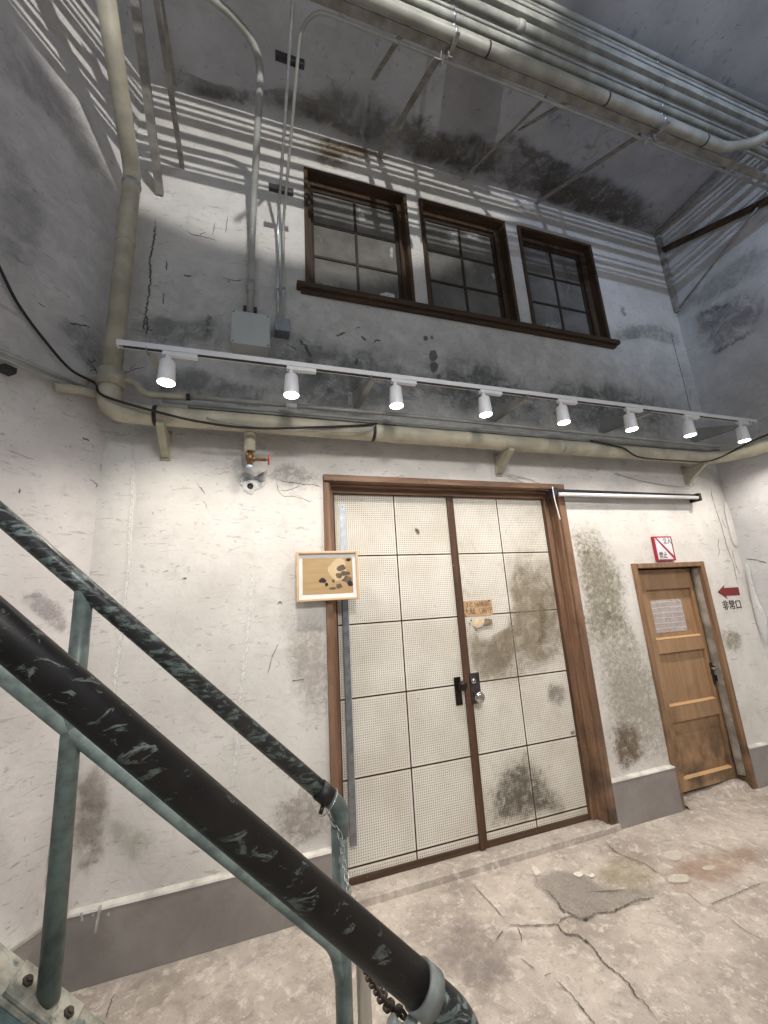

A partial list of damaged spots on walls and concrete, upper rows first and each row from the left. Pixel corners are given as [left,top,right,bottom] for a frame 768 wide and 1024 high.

leakage [290,93,383,159]
leakage [398,119,652,226]
crack [143,227,168,333]
leakage [577,535,627,637]
leakage [615,724,642,767]
crack [475,887,653,1024]
crack [687,883,761,939]